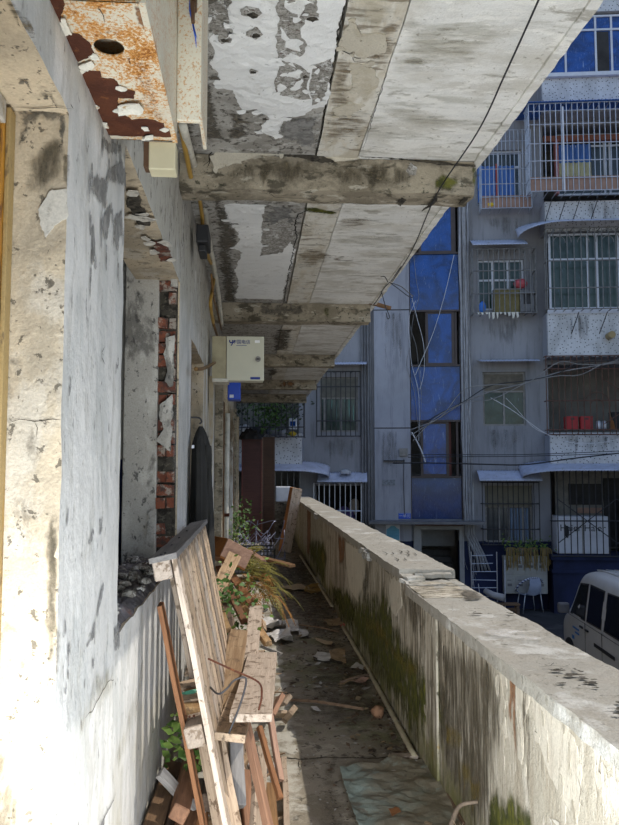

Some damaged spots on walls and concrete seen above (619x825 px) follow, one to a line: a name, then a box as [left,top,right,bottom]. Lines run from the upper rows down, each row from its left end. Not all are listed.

corrosion [50,0,171,137]
peeling [208,0,387,139]
peeling [89,122,178,293]
peeling [221,203,296,300]
damp [245,161,300,183]
damp [338,165,408,183]
spalling [146,279,178,552]
damp [438,639,500,820]